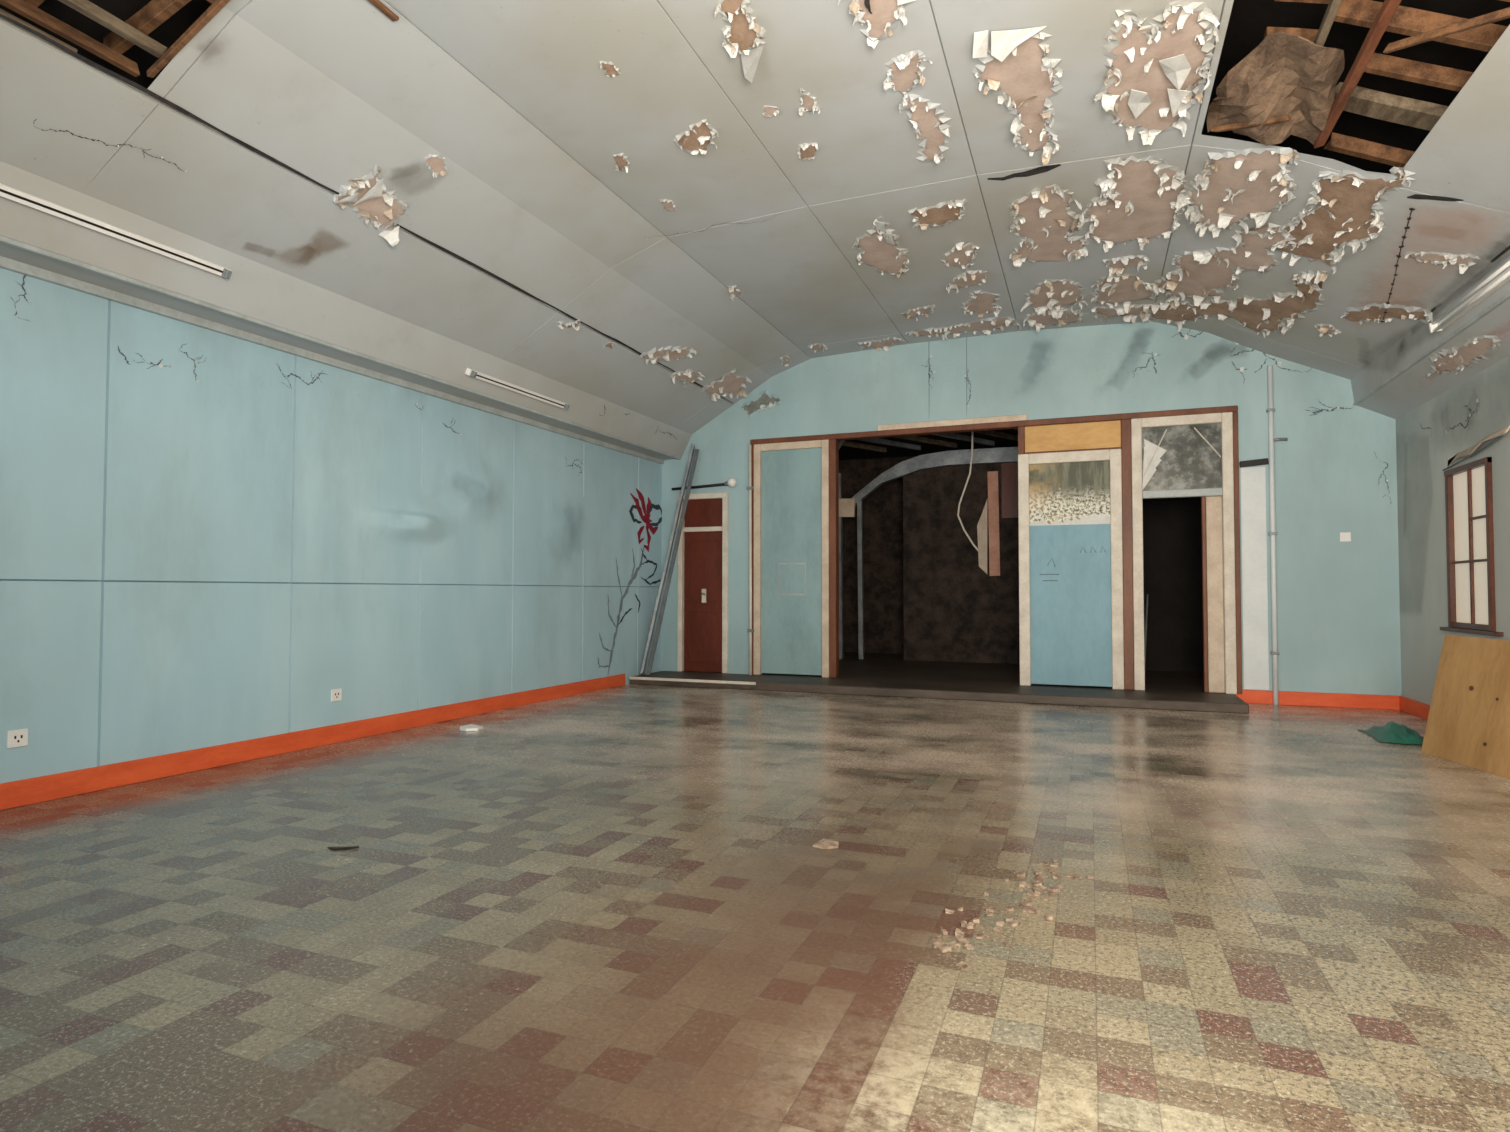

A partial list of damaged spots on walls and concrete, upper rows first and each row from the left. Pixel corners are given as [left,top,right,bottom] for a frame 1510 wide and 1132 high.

peeling [714,0,766,83]
peeling [838,0,952,165]
peeling [332,164,410,246]
peeling [423,153,447,178]
peeling [797,142,819,161]
peeling [852,0,1433,352]
crack [11,275,34,322]
crack [118,344,207,382]
crack [275,362,327,390]
peeling [640,345,783,419]